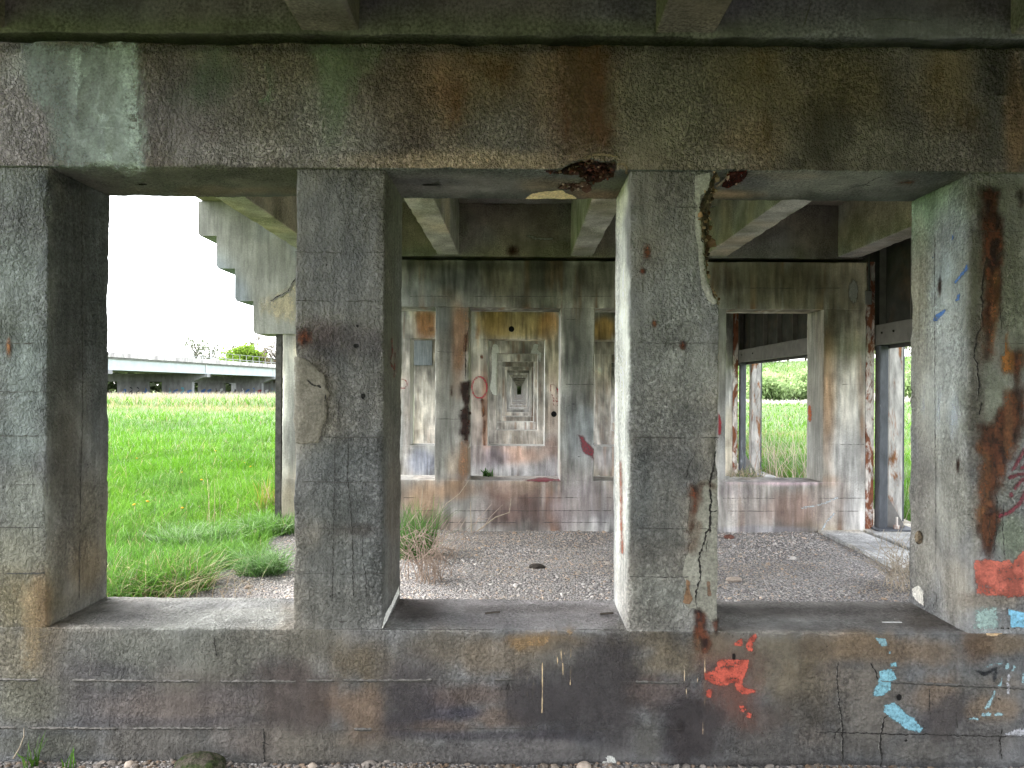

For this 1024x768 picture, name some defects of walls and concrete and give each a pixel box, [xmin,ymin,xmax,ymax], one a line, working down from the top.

spalling [526,153,628,199]
spalling [694,169,747,305]
crack [972,254,1002,415]
corrosion [977,187,1024,557]
crack [686,436,719,606]
corrosion [694,608,718,653]
crack [817,663,1022,766]